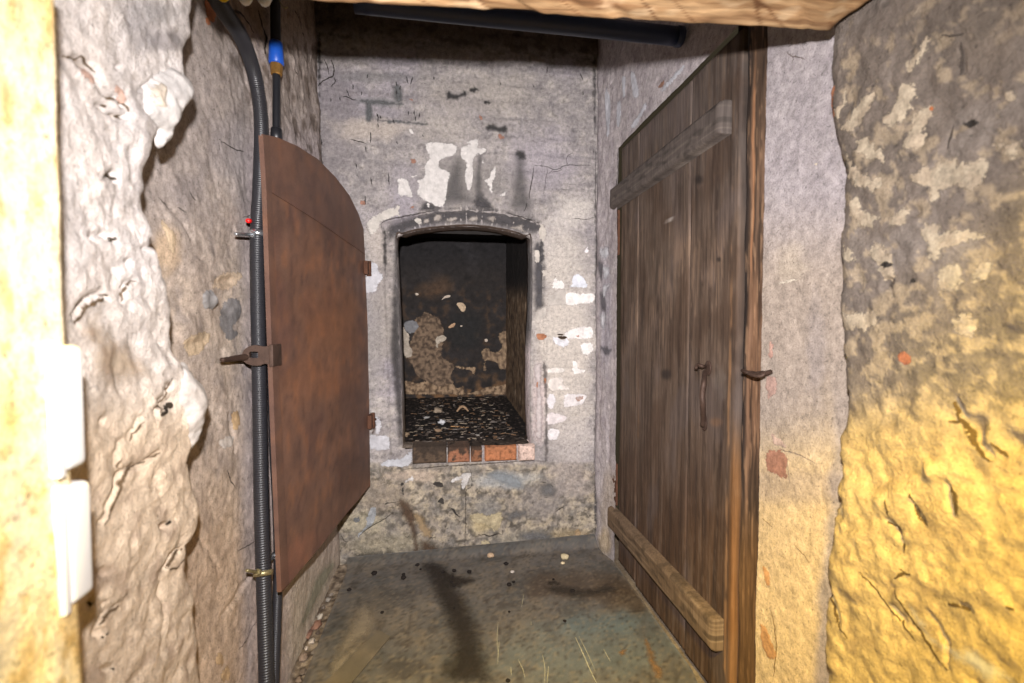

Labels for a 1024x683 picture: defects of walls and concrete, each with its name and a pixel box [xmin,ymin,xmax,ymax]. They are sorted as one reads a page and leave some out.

crack [381,210,435,227]
flaking render [367,139,505,234]
damp [515,169,528,208]
crack [506,149,597,265]
flaking render [535,289,579,340]
spalling [402,312,507,432]
crack [948,401,1009,462]
crack [859,494,948,671]